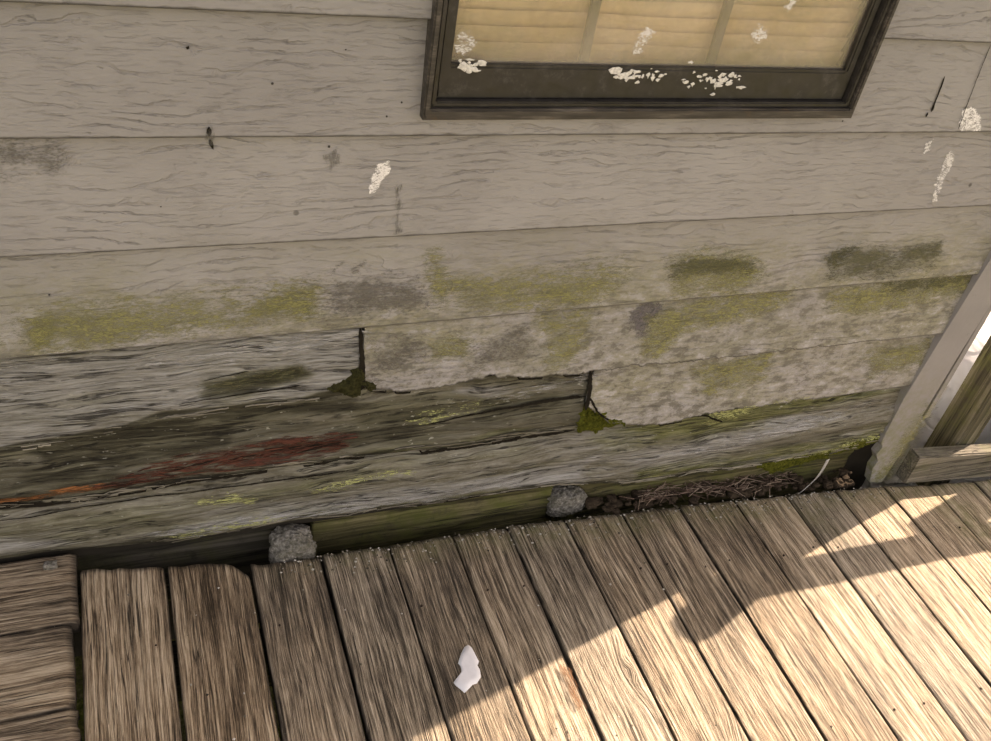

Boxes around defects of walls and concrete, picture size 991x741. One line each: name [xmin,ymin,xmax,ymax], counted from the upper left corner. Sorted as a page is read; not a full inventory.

crack [926,76,945,117]
crack [958,45,991,129]
water stain [669,257,753,278]
water stain [884,275,971,292]
crack [358,328,411,394]
crack [419,371,609,454]
water stain [0,432,359,504]